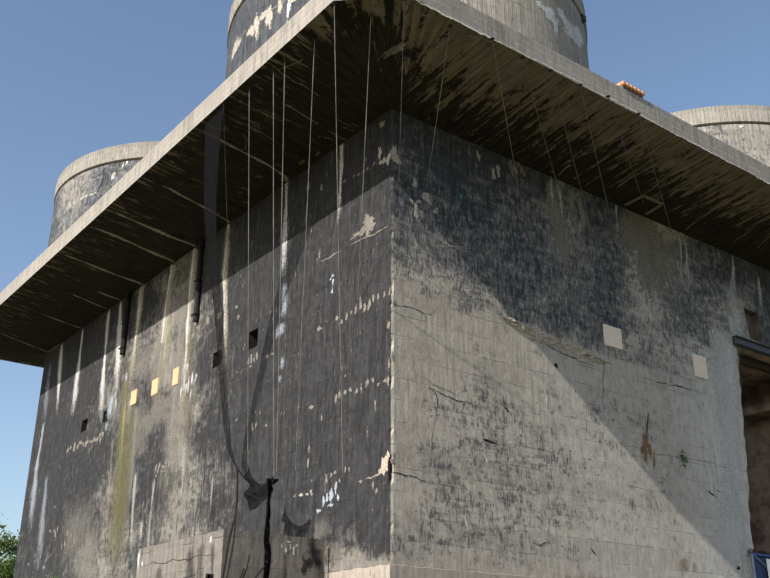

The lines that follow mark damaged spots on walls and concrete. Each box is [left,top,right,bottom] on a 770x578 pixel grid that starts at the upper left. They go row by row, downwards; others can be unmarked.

peeling [231,0,296,60]
peeling [342,142,402,183]
peeling [350,214,388,245]
water stain [165,186,231,353]
water stain [43,314,84,411]
water stain [95,213,198,494]
water stain [30,425,44,519]
water stain [66,255,145,578]
spalling [359,451,395,493]
crack [424,377,475,454]
rust [641,413,655,467]
crack [144,554,212,578]